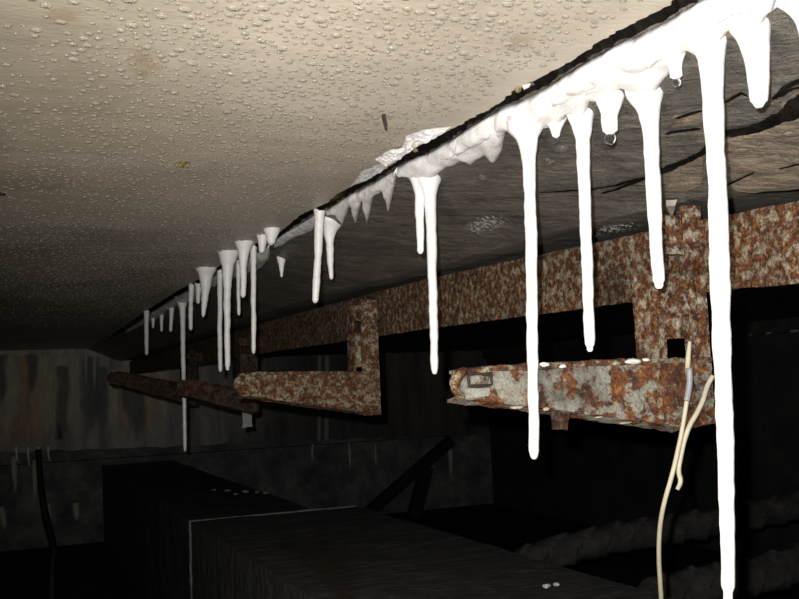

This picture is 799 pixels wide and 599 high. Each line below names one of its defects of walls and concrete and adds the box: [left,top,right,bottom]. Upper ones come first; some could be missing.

crack [277,0,706,238]
efflorescence [326,0,799,225]
crack [724,79,799,138]
crack [727,172,755,186]
crack [102,256,239,342]
efflorescence [126,215,315,333]
corrosion [140,369,171,380]